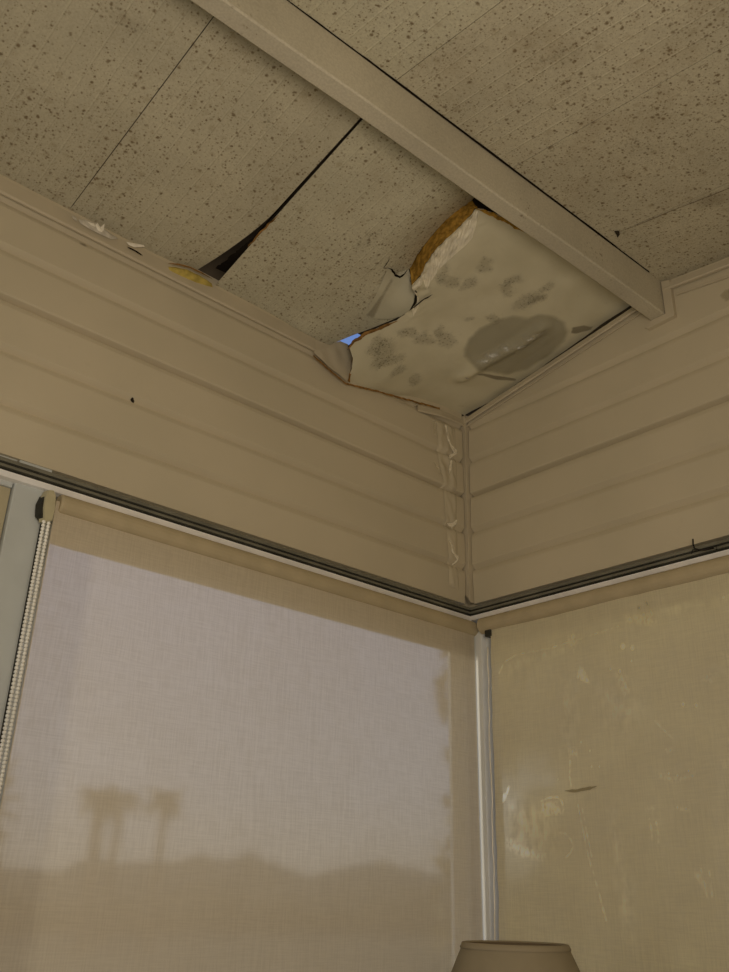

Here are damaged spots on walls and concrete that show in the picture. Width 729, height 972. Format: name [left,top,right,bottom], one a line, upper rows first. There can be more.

crack [216,124,355,273]
crack [287,0,729,272]